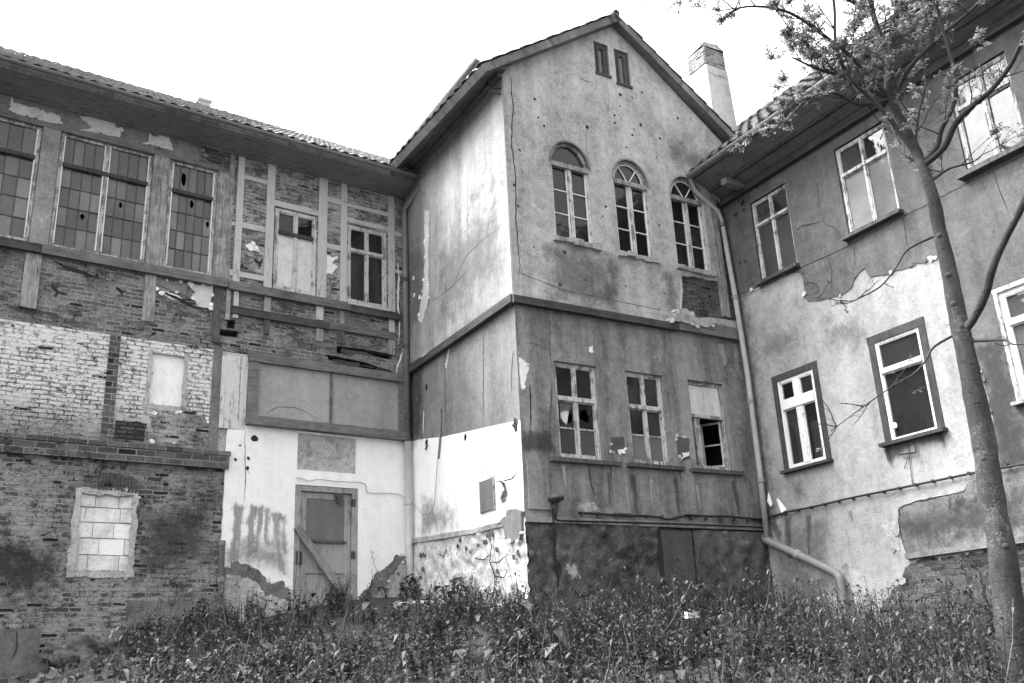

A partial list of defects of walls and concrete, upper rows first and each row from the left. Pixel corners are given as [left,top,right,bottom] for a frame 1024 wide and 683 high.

peeling [7,96,63,124]
peeling [76,113,124,137]
flaking render [156,279,214,310]
peeling [412,209,430,323]
crack [429,81,667,311]
flaking render [666,199,746,329]
crack [740,156,1022,298]
flaking render [519,358,530,390]
flaking render [223,561,292,622]
flaking render [360,552,426,599]
flaking render [880,480,995,640]
flaking render [1002,465,1024,596]